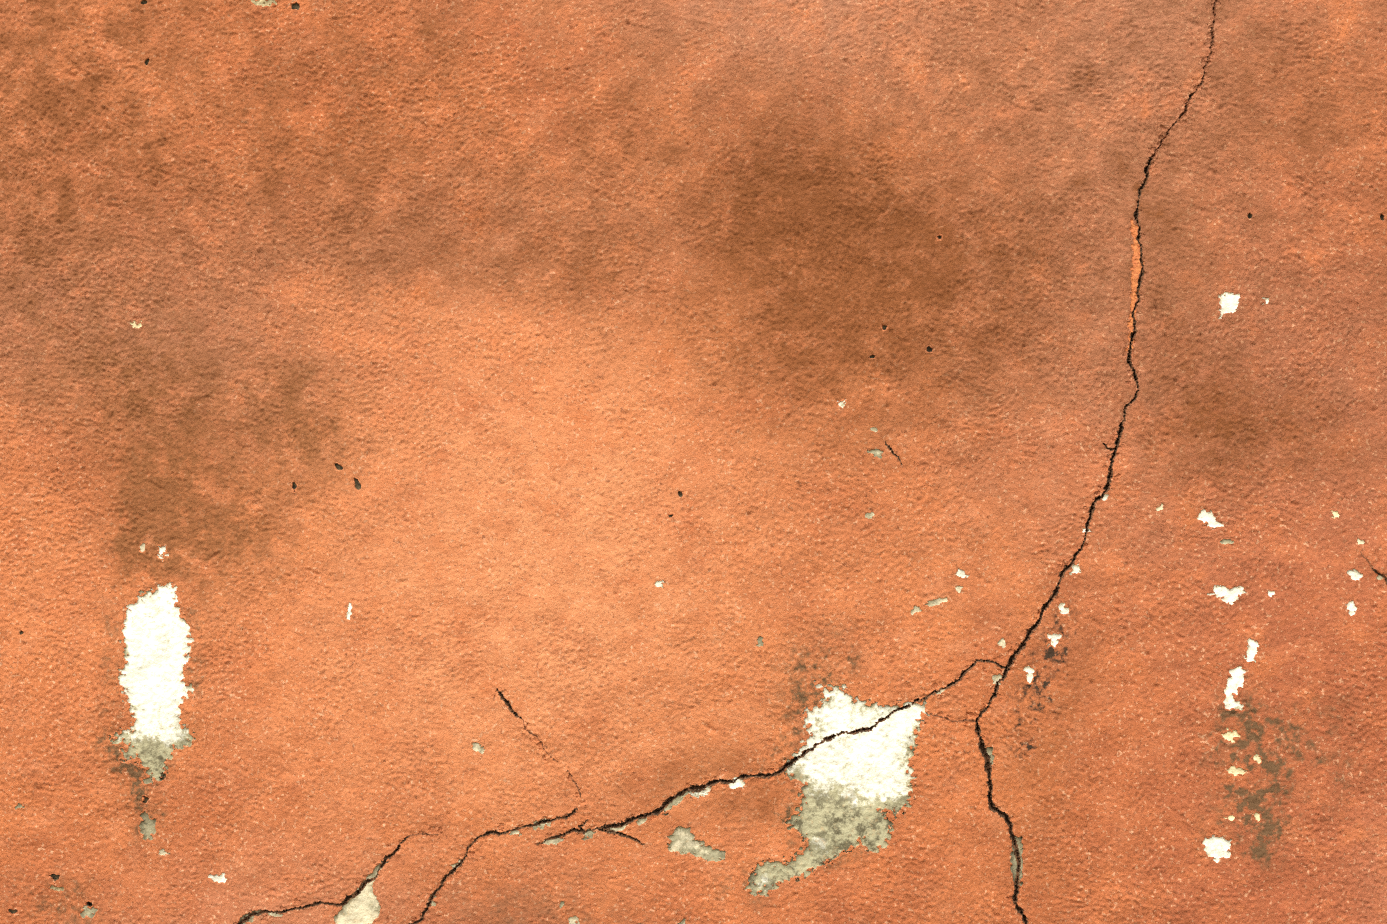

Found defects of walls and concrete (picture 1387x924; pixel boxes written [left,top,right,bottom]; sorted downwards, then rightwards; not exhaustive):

spalling [140,543,169,561]
crack [233,0,1219,924]
spalling [109,582,196,856]
spalling [744,680,930,897]